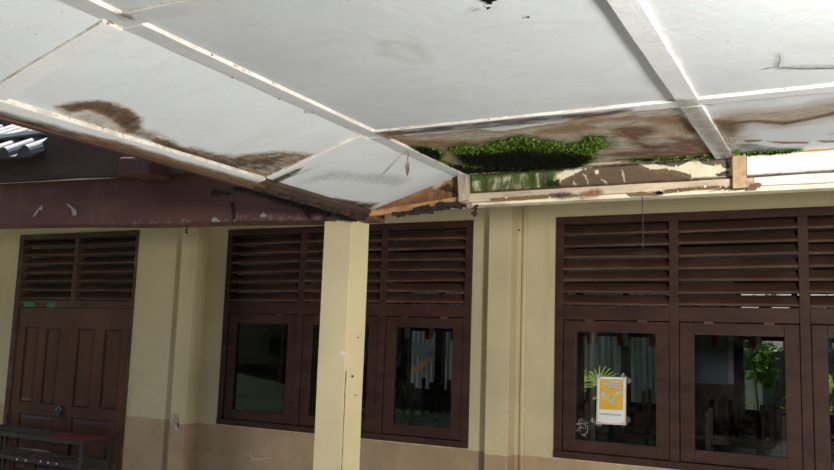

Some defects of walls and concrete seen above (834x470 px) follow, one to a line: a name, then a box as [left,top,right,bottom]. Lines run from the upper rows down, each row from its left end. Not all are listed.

damp [374,100,834,175]
damp [57,101,330,220]
damp [333,198,377,209]
damp [471,176,733,199]
peeling [490,159,730,202]
damp [747,170,834,178]